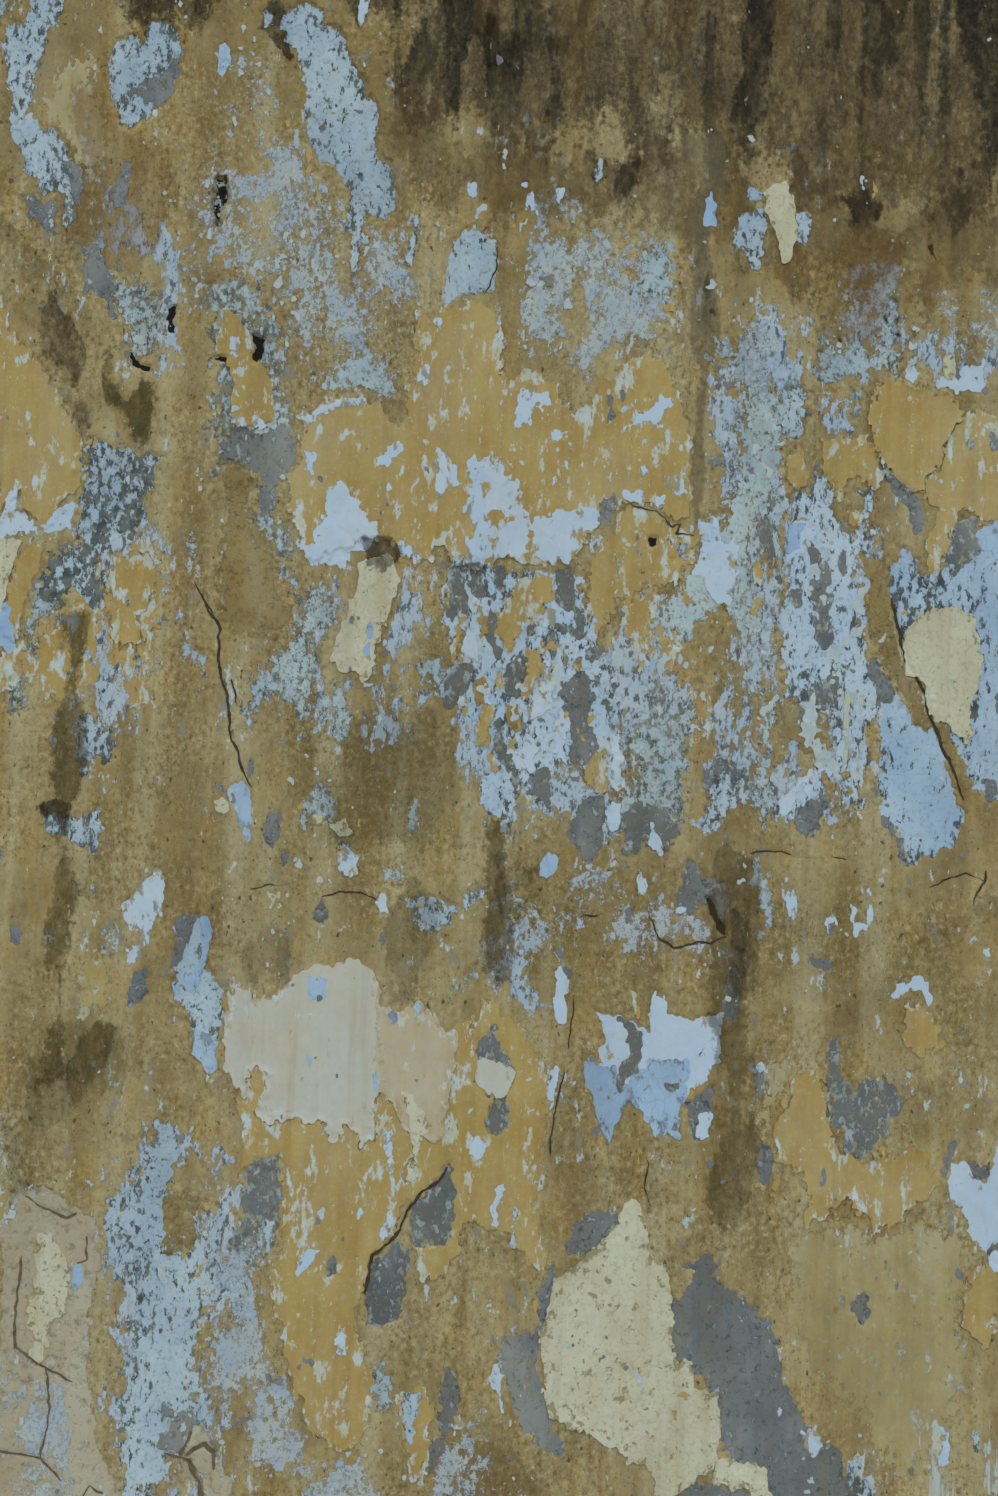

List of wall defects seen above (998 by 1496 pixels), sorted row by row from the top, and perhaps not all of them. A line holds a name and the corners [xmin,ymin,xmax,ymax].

damp [120,0,220,42]
damp [261,1,294,61]
damp [356,0,998,352]
crack [193,575,252,787]
peeling [92,868,228,1075]
peeling [473,1024,516,1136]
peeling [449,918,573,1025]
peeling [547,856,798,1143]
peeling [891,975,933,1006]
peeling [941,1140,998,1272]
peeling [0,1118,284,1496]
peeling [489,1266,565,1456]